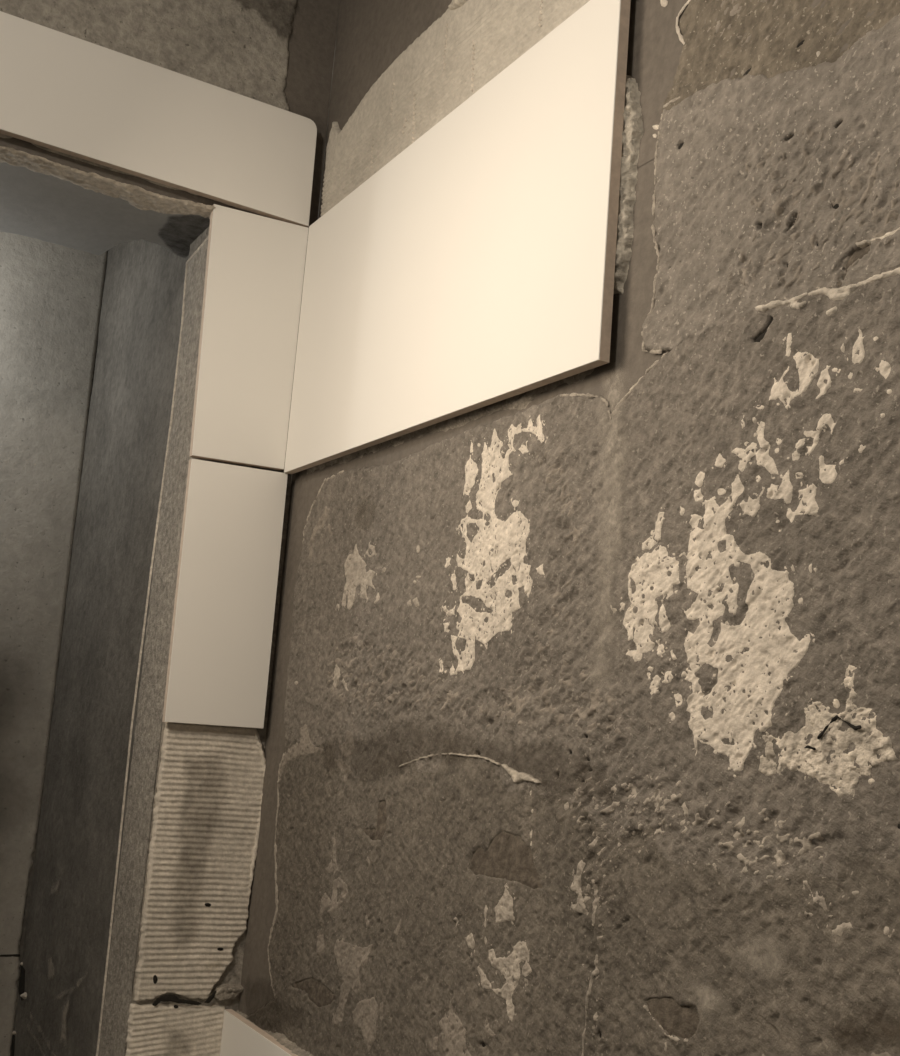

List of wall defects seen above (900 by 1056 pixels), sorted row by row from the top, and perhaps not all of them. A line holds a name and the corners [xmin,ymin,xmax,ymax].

flaking render [325,329,899,944]
flaking render [279,720,323,783]
flaking render [320,833,350,917]
crack [152,990,217,1006]
flaking render [292,934,384,1052]